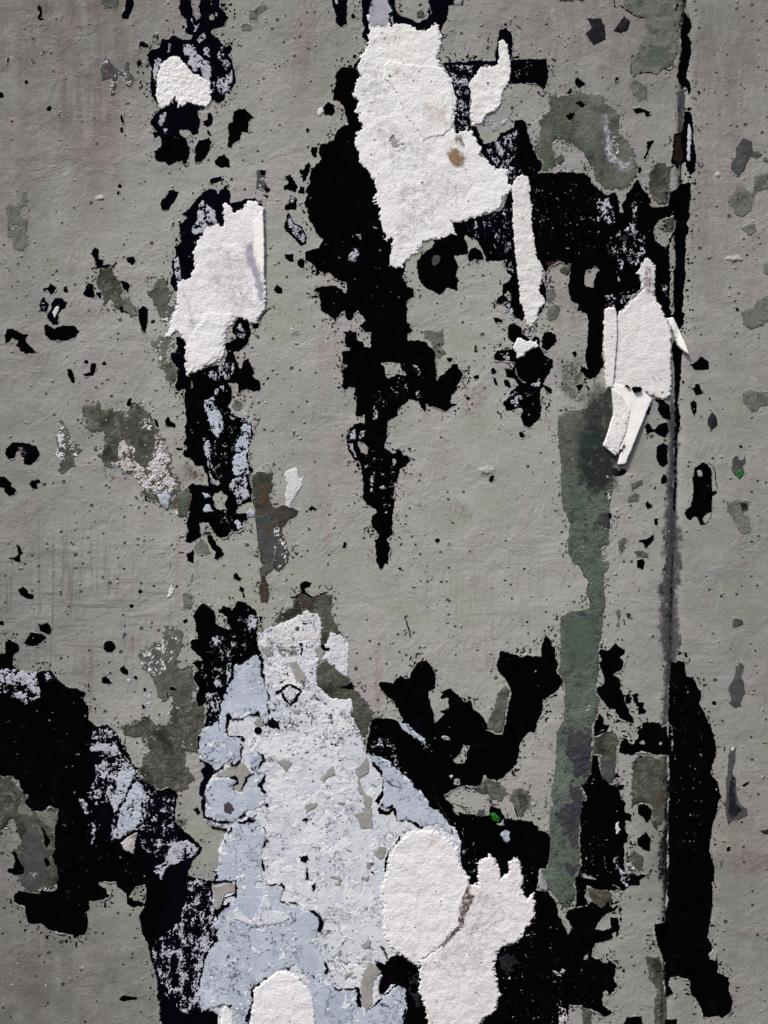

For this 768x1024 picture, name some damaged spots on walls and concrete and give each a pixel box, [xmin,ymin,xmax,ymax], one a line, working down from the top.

peeling [332,0,373,46]
peeling [387,0,463,42]
peeling [585,17,607,45]
peeling [613,16,630,34]
peeling [100,0,242,176]
peeling [633,106,652,117]
peeling [215,108,254,168]
peeling [284,49,557,570]
peeling [77,170,304,603]
peeling [645,397,671,484]
peeling [620,479,652,509]
peeling [633,518,659,570]